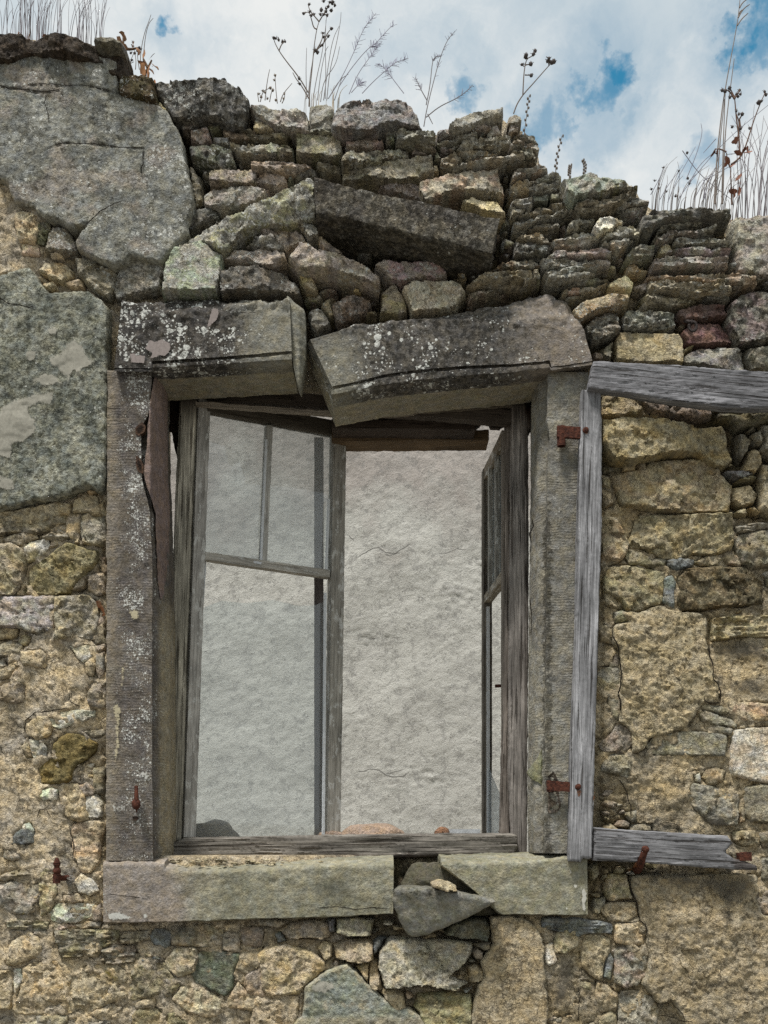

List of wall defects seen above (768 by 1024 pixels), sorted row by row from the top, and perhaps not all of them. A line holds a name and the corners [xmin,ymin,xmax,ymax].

crack [0,83,144,174]
crack [599,628,622,712]
crack [704,644,721,704]